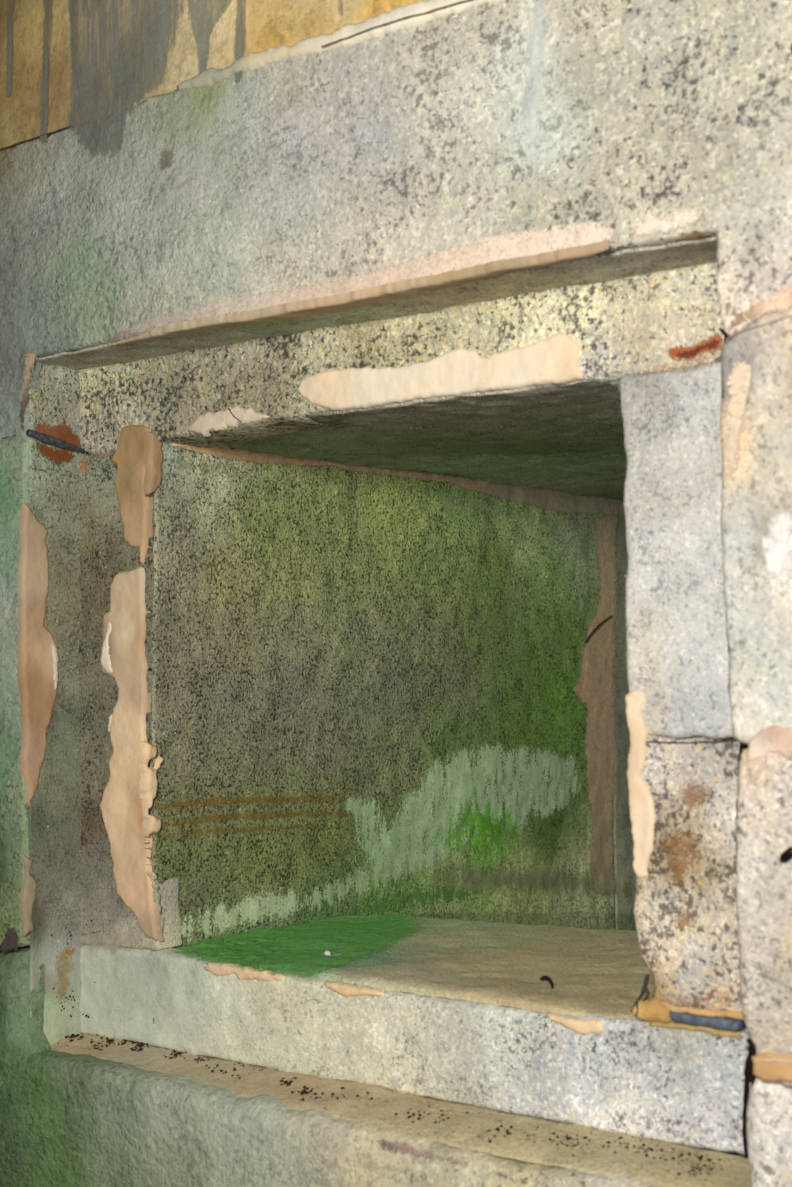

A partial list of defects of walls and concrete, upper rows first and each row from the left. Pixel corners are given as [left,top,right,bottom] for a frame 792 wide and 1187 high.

leakage [6,0,14,97]
leakage [40,0,52,142]
leakage [69,0,245,153]
corrosion [661,334,723,370]
crack [719,316,791,344]
corrosion [34,423,88,471]
peeling [51,644,59,689]
peeling [100,622,112,672]
crack [646,739,747,772]
peeling [137,741,164,933]
peeling [649,1002,744,1038]
crack [742,1038,792,1158]